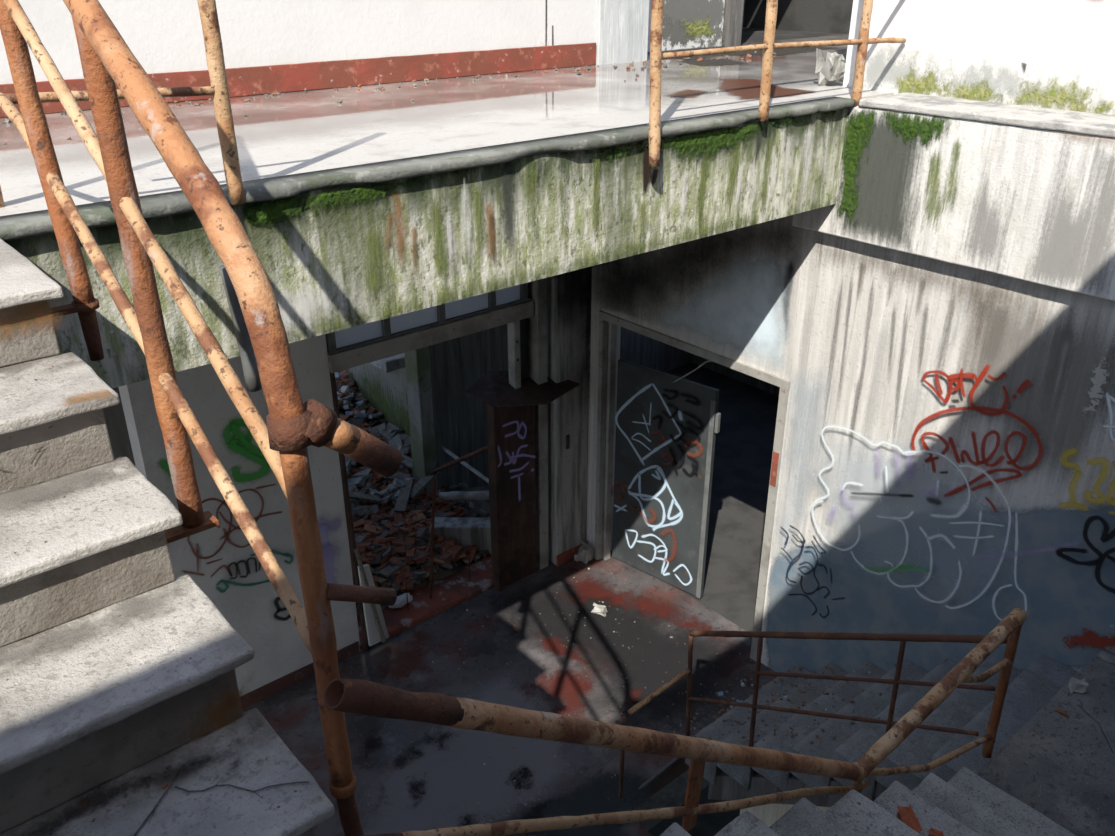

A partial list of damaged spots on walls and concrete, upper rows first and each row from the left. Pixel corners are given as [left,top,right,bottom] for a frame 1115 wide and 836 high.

leakage [867,48,1047,99]
leakage [491,163,514,256]
leakage [756,122,790,194]
leakage [804,128,828,178]
leakage [839,114,919,247]
leakage [966,186,1005,257]
leakage [1033,157,1115,292]
leakage [280,289,343,330]
crack [133,771,310,836]
leakage [511,772,651,836]